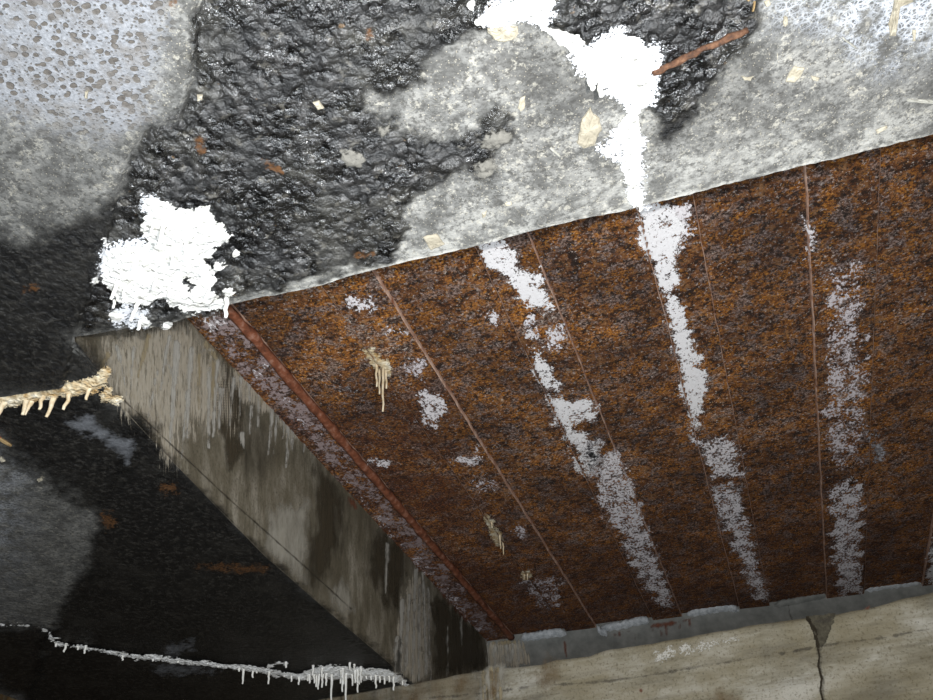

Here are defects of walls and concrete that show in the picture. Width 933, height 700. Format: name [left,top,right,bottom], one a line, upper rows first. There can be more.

leakage [467,0,664,212]
leakage [660,112,693,141]
leakage [0,192,530,700]
crack [816,648,824,700]